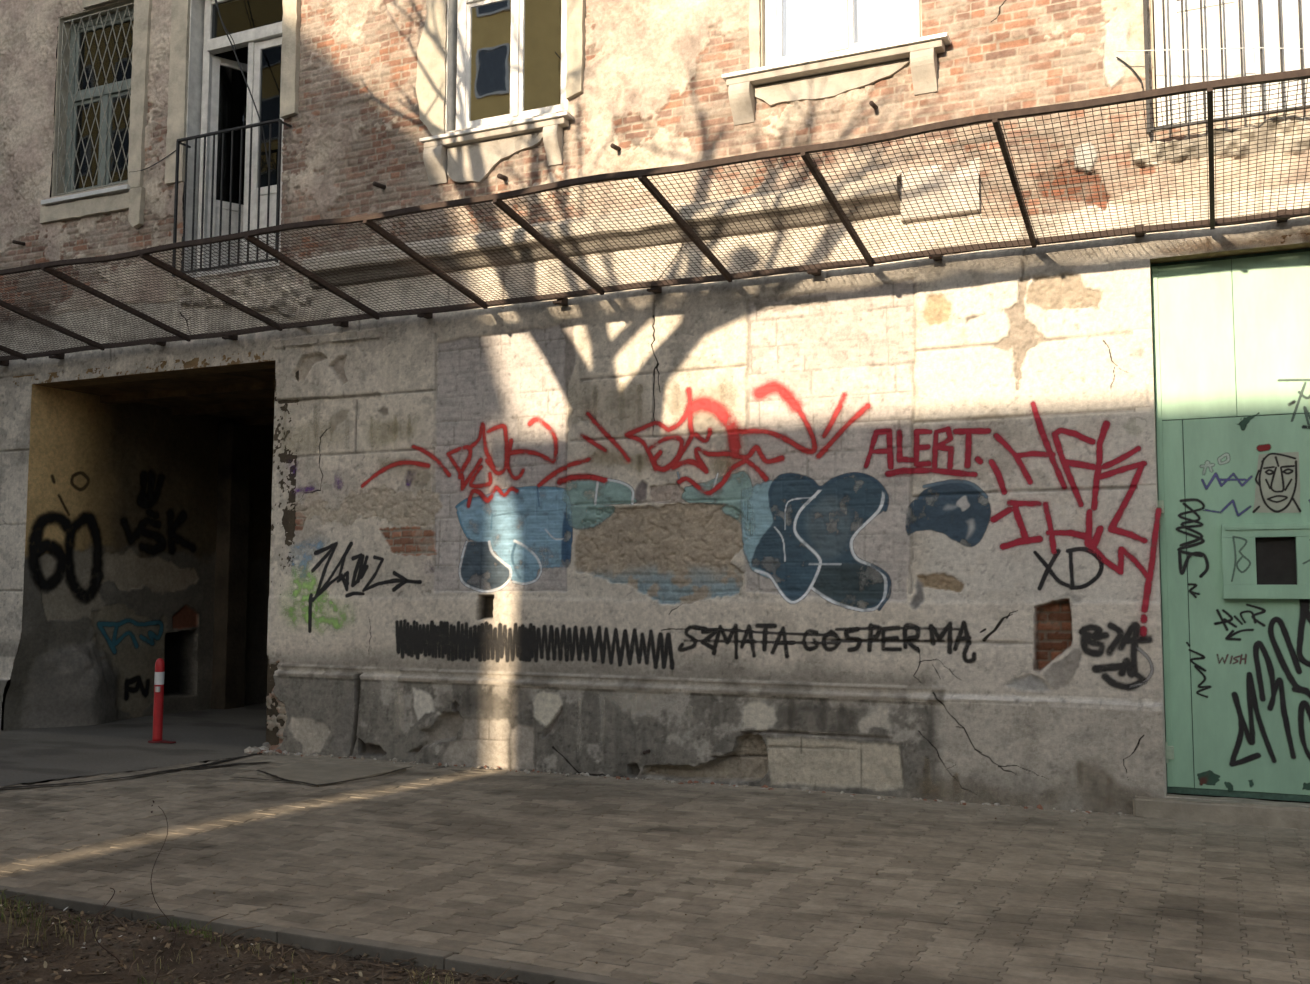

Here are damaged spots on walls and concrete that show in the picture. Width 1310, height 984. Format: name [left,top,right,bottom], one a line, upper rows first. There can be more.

spalling [1036,140,1114,210]
spalling [1126,110,1310,168]
spalling [921,270,1107,393]
spalling [282,482,444,557]
spalling [572,476,748,606]
spalling [1001,589,1088,694]
spalling [265,657,333,755]
spalling [348,671,566,772]
crack [913,647,1045,790]